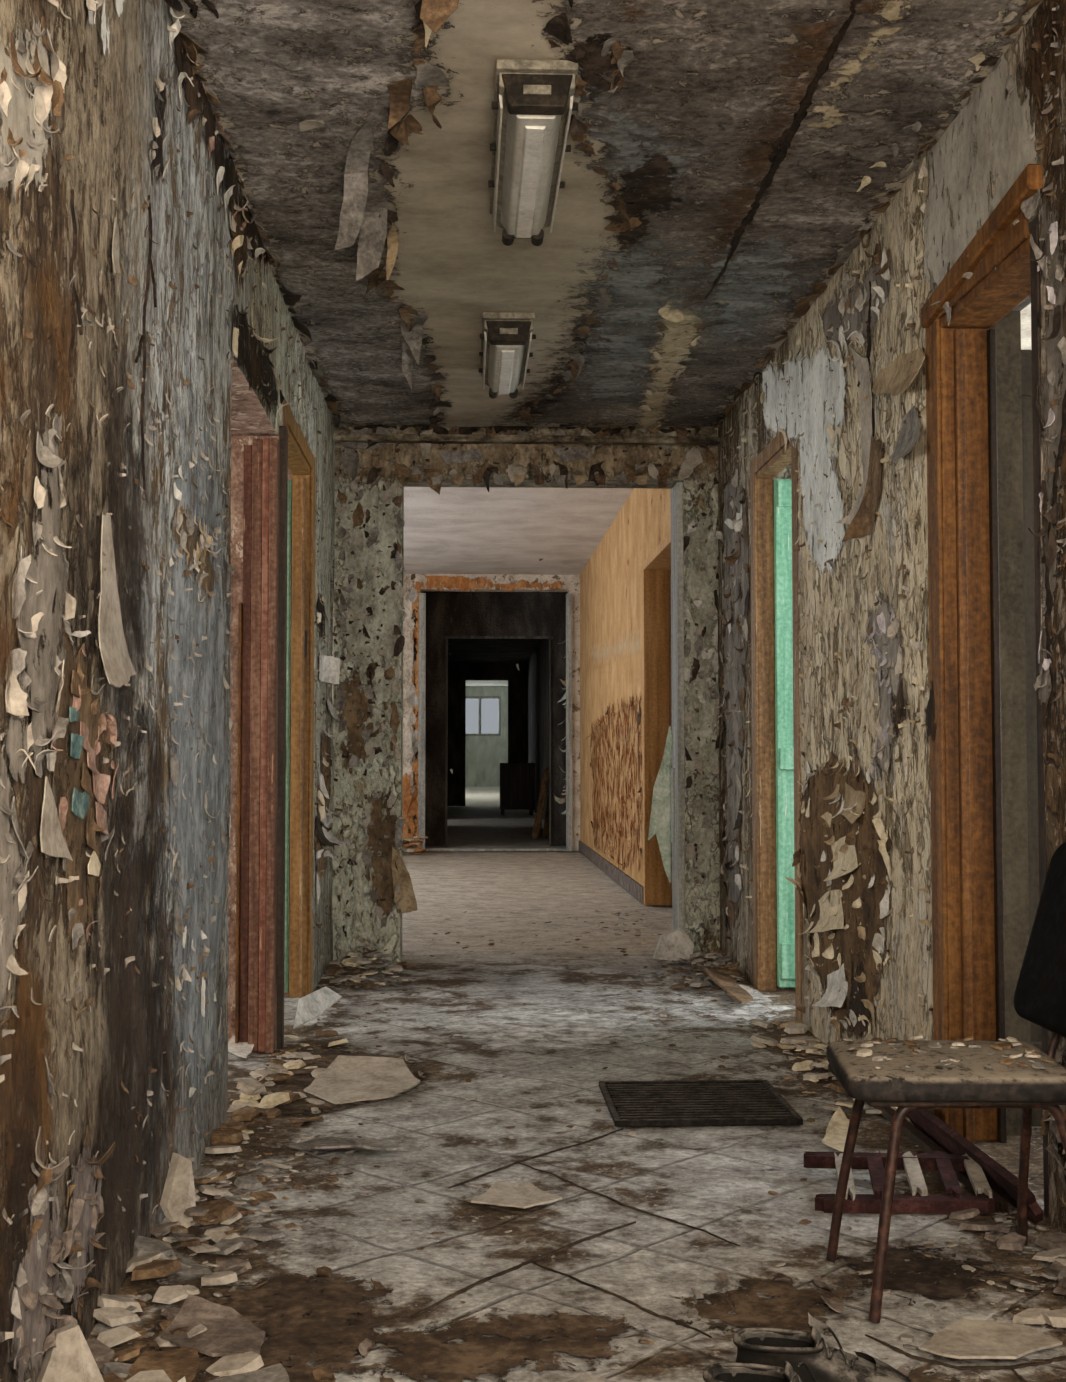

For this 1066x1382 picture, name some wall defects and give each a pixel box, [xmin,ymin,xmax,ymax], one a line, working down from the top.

peeling [86,0,126,55]
peeling [0,0,73,208]
peeling [91,203,138,285]
peeling [77,304,178,437]
peeling [131,0,1066,1041]
peeling [1040,1105,1066,1207]
peeling [316,1266,332,1277]
peeling [358,1327,384,1357]
crack [411,1128,740,1338]
peeling [808,1295,845,1335]